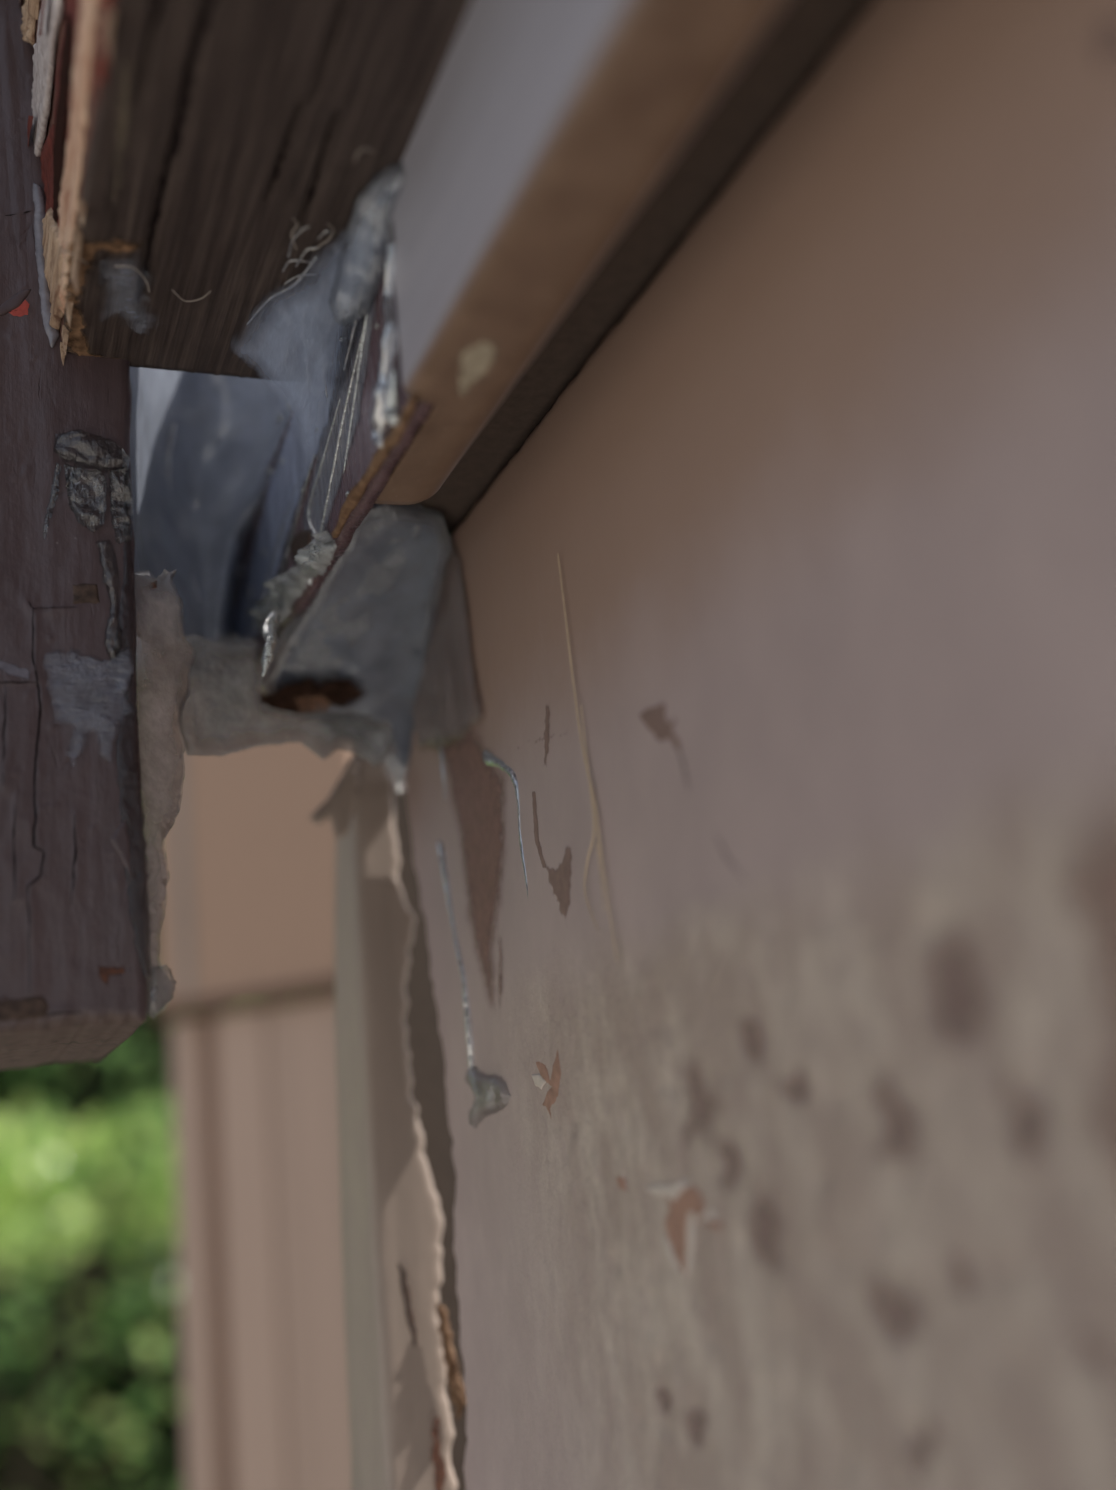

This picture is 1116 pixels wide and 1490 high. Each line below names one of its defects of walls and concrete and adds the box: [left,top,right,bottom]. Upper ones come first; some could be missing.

peeling [0,0,80,348]
crack [144,0,215,291]
crack [269,106,332,212]
peeling [640,703,681,752]
crack [0,602,77,984]
peeling [547,848,571,916]
peeling [616,1176,722,1282]
rust [431,1417,446,1490]